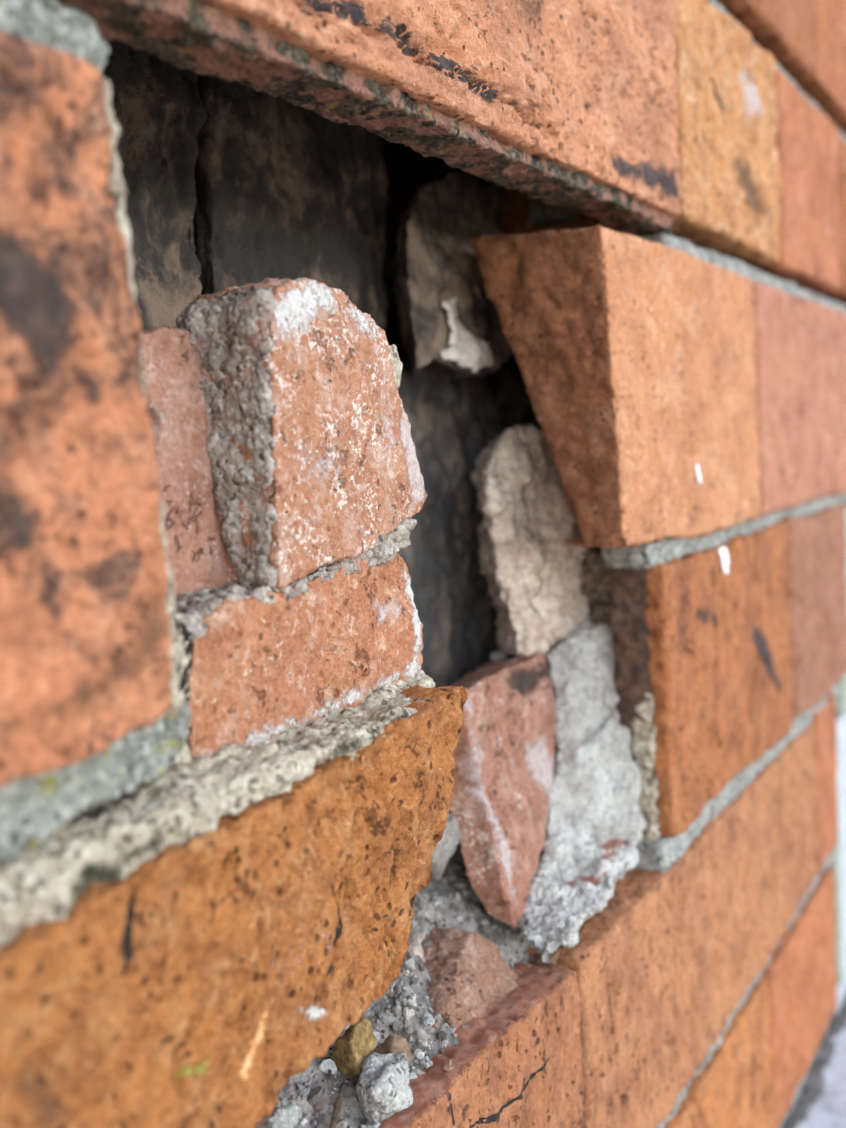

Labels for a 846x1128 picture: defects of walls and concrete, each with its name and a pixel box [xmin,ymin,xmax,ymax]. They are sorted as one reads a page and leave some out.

peeling [440,298,494,373]
spalling [174,277,427,592]
spalling [565,839,628,886]
spalling [0,684,571,1128]
crack [444,1056,551,1128]